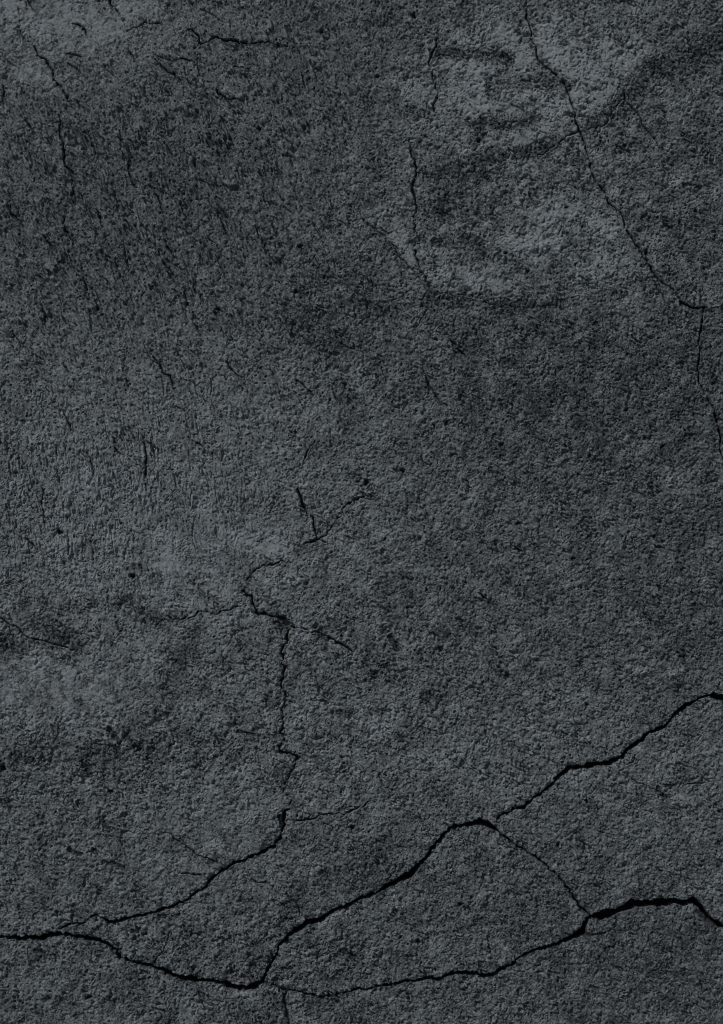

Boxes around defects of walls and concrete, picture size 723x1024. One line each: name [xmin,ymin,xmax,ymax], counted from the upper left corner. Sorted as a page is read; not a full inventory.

crack [524,0,723,461]
crack [0,483,723,1024]